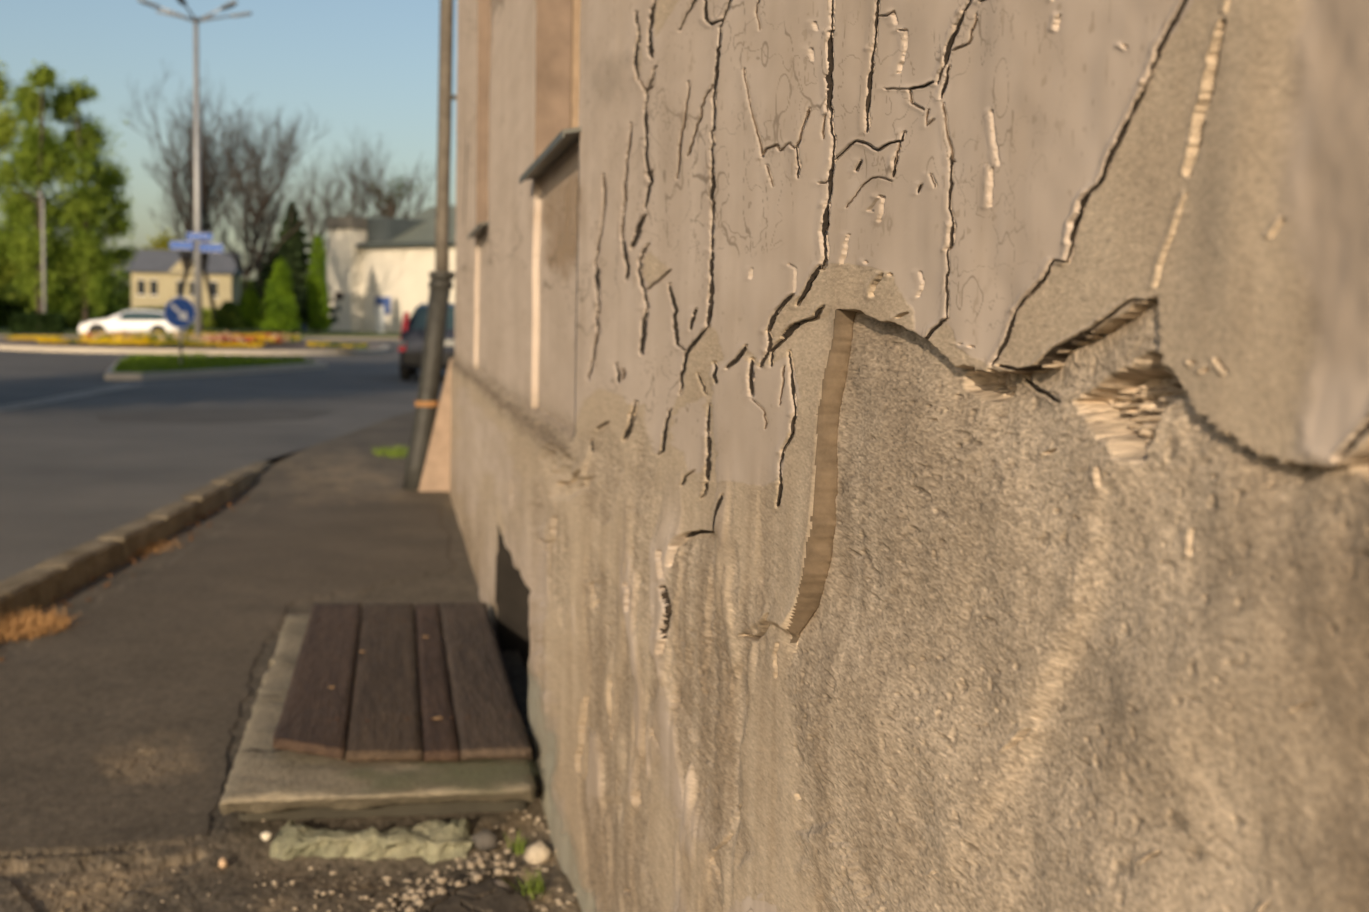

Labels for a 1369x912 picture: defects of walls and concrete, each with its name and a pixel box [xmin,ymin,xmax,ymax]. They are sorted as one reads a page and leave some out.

crack [588,0,983,645]
spalling [658,0,1369,912]
crack [992,0,1187,402]
crack [1335,420,1369,461]